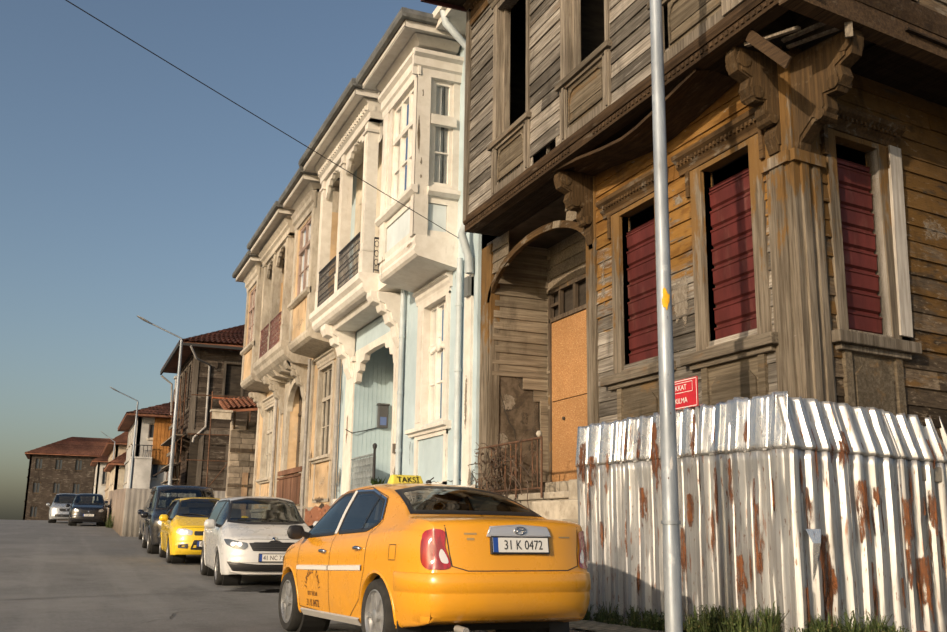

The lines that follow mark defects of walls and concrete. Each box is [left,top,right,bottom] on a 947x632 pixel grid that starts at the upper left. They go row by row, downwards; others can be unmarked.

peeling [672,272,690,329]
rust [577,443,609,561]
rust [624,423,661,520]
rust [680,414,701,591]
rust [711,428,765,608]
rust [799,458,813,529]
rust [820,534,838,627]
rust [829,431,850,468]
rust [854,480,884,543]
rust [901,460,946,624]